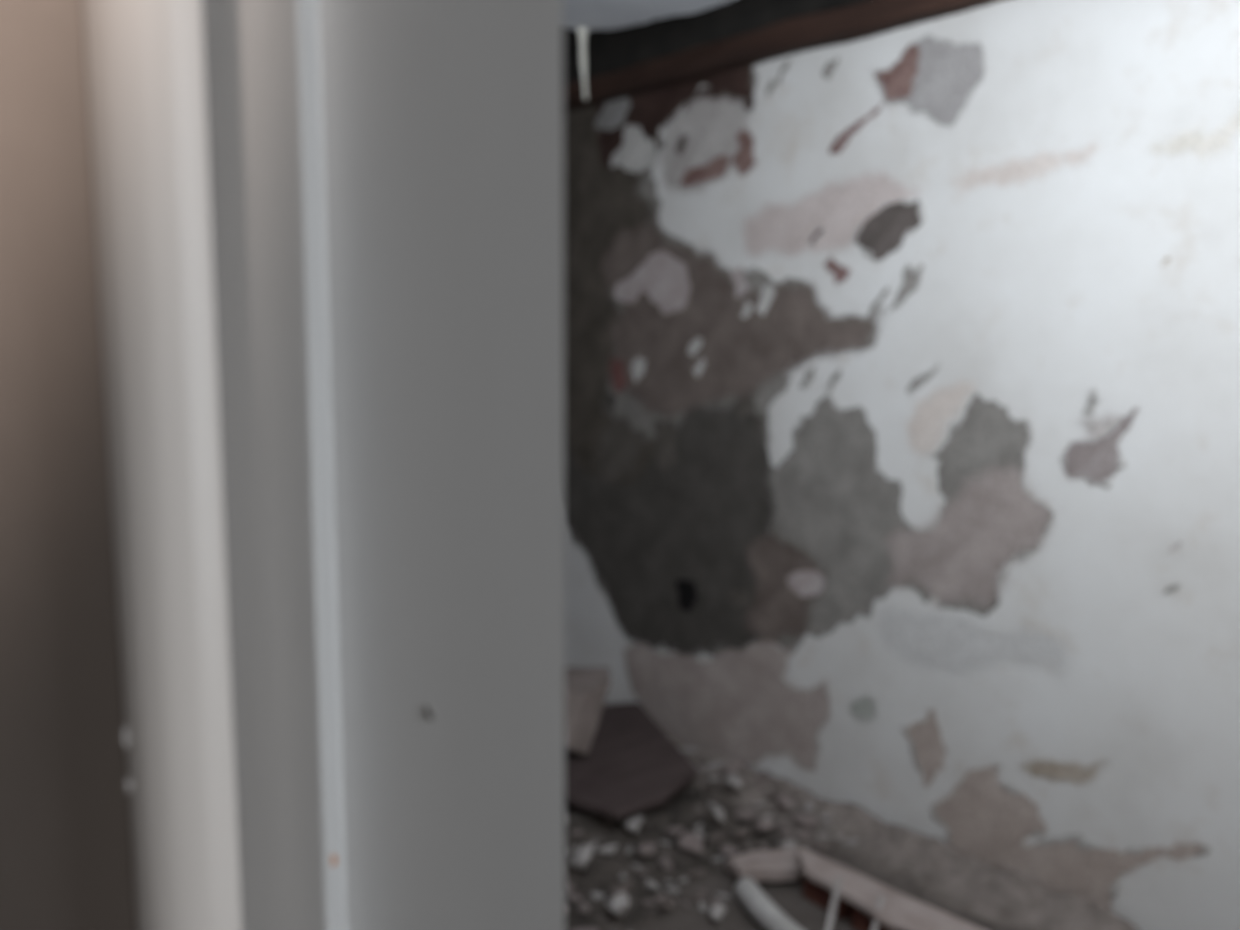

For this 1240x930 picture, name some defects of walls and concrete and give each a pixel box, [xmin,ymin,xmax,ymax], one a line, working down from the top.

peeling [871,32,986,128]
flaking render [563,64,1056,660]
peeling [1059,387,1139,489]